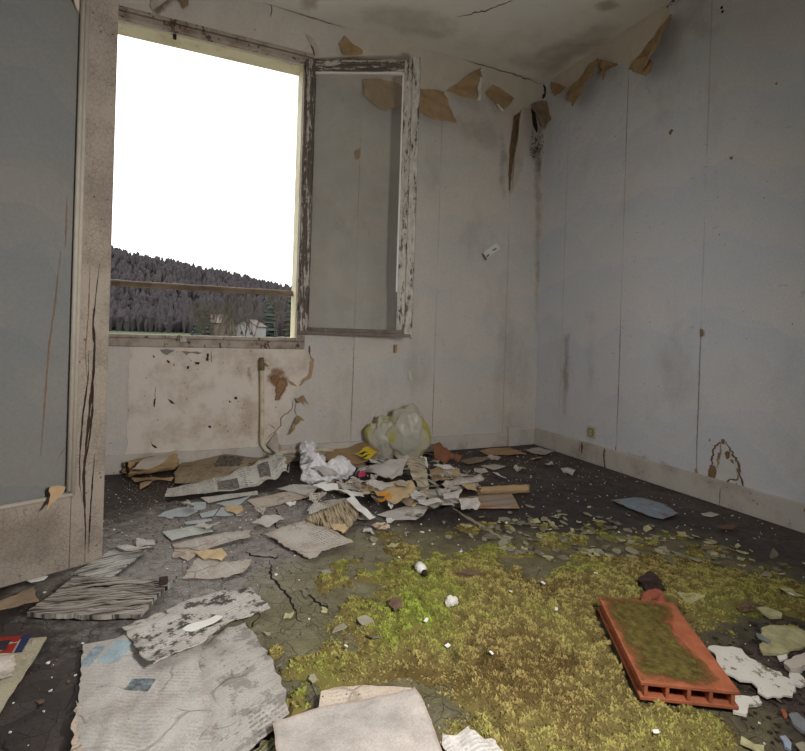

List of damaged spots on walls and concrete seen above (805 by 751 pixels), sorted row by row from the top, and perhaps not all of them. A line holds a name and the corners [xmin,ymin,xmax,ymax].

crack [459,1,511,17]
flaking render [348,0,679,114]
crack [40,205,100,553]
flaking render [708,439,743,486]